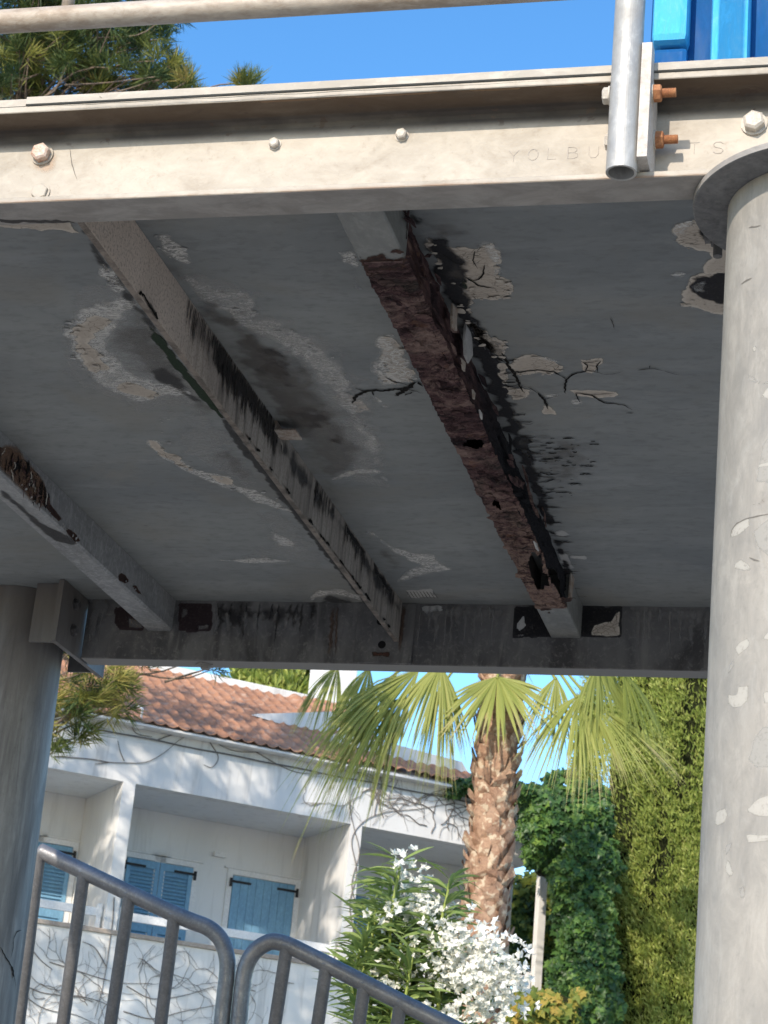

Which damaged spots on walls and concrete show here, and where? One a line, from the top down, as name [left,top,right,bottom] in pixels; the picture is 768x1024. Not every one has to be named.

peeling [671,219,726,315]
peeling [64,297,191,401]
leakage [186,278,378,518]
crack [332,377,422,413]
peeling [372,335,417,384]
corrosion [355,210,575,613]
spalling [424,238,563,400]
leakage [429,239,596,574]
crack [496,353,677,415]
leakage [344,524,394,604]
peeling [513,606,551,638]
peeling [581,606,622,638]